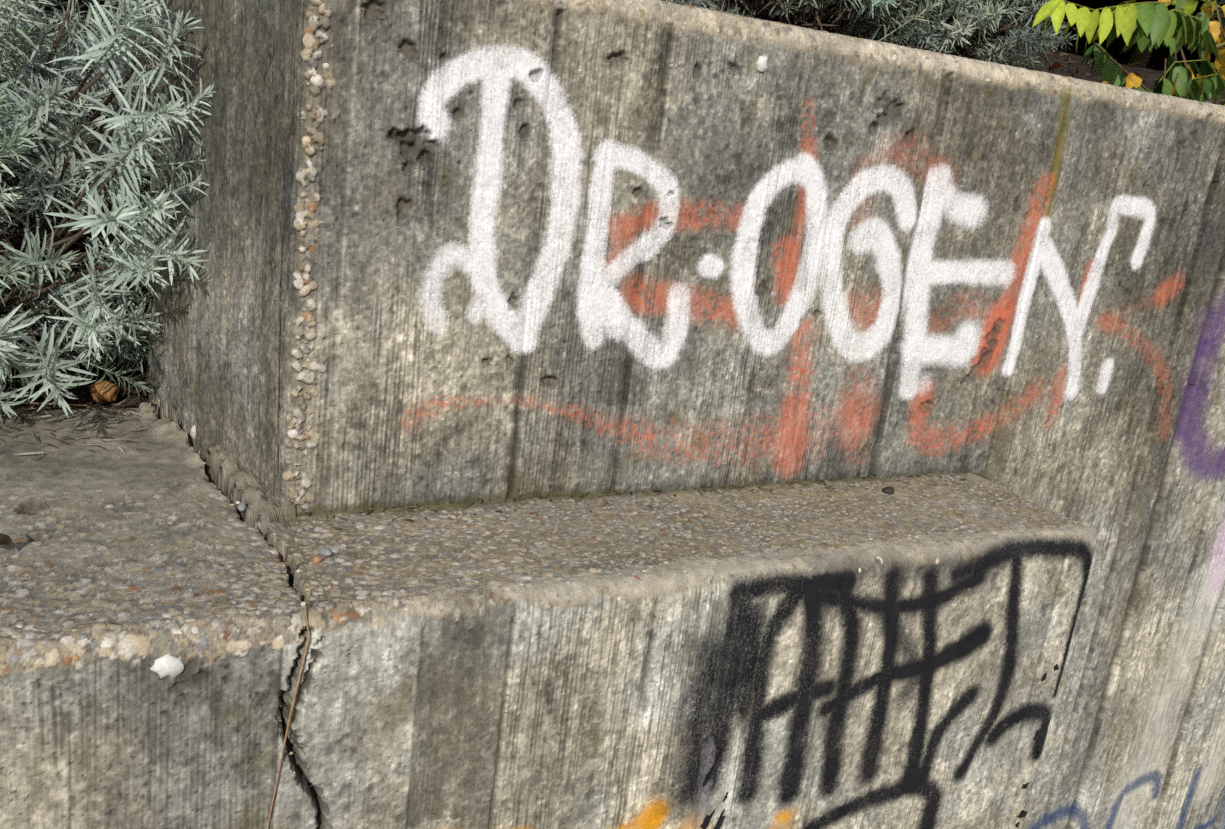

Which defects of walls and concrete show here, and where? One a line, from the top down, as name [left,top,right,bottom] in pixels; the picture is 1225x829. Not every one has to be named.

crack [275,233,283,476]
crack [148,395,333,829]